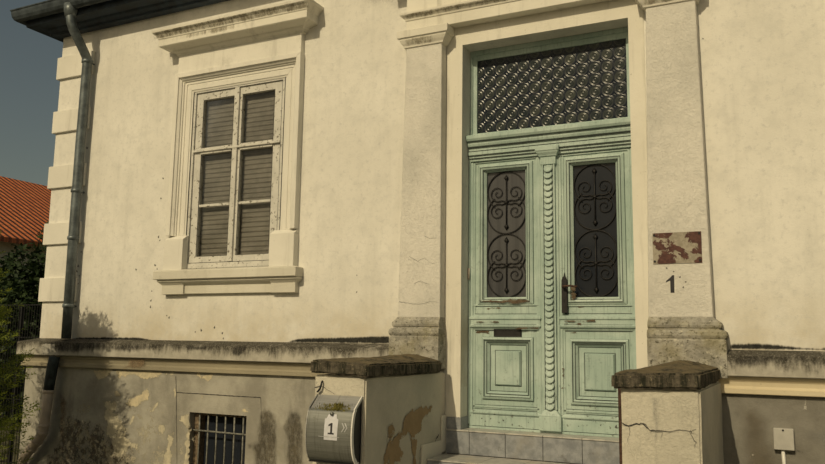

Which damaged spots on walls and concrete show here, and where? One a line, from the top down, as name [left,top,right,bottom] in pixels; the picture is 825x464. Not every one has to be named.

water stain [58,337,150,351]
water stain [731,344,813,364]
spalling [49,369,195,464]
water stain [254,412,275,464]
water stain [287,414,301,464]
peeling [384,406,432,464]
crack [622,423,696,444]